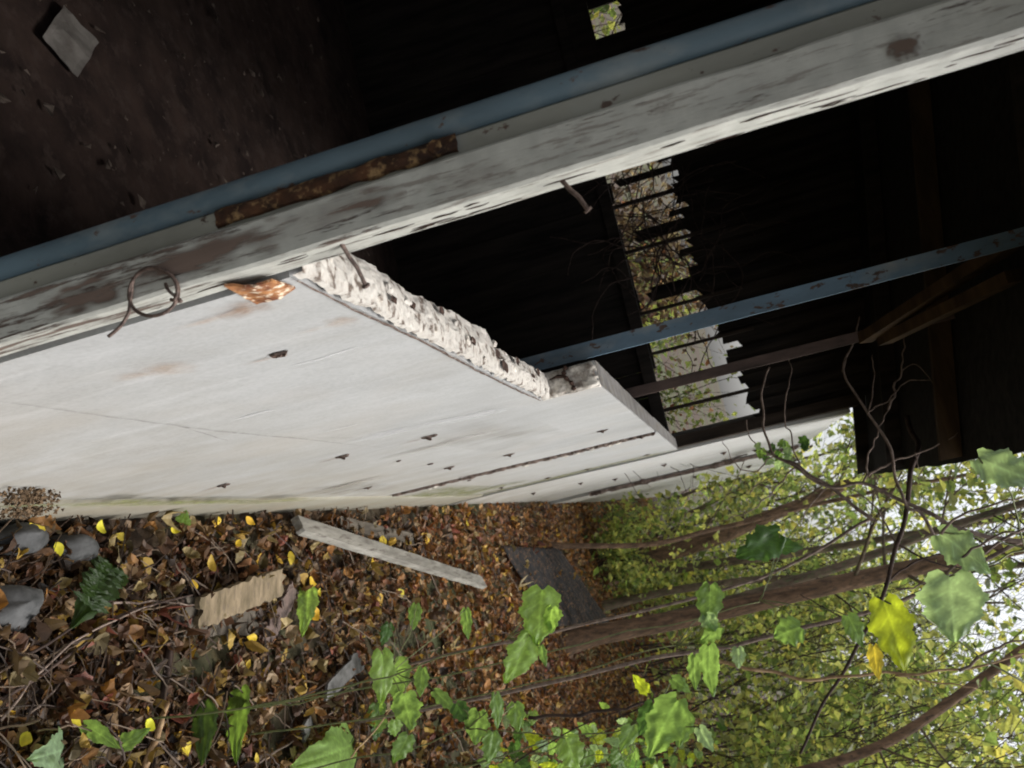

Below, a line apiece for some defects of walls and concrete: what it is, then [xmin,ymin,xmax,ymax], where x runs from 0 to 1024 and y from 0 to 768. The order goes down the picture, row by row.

peeling [326,187,386,216]
spalling [293,253,550,401]